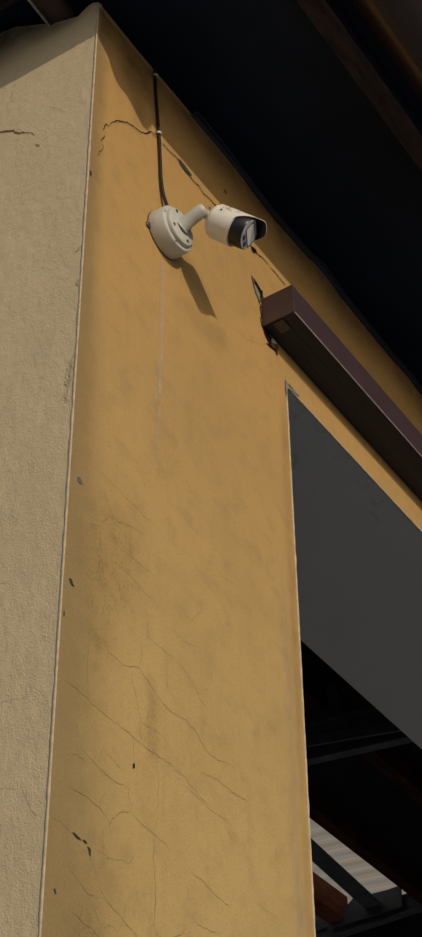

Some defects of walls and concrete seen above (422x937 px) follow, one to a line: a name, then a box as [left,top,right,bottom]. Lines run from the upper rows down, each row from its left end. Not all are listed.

crack [99,120,217,206]
crack [250,245,286,285]
spalling [251,275,279,355]
crack [64,656,246,937]